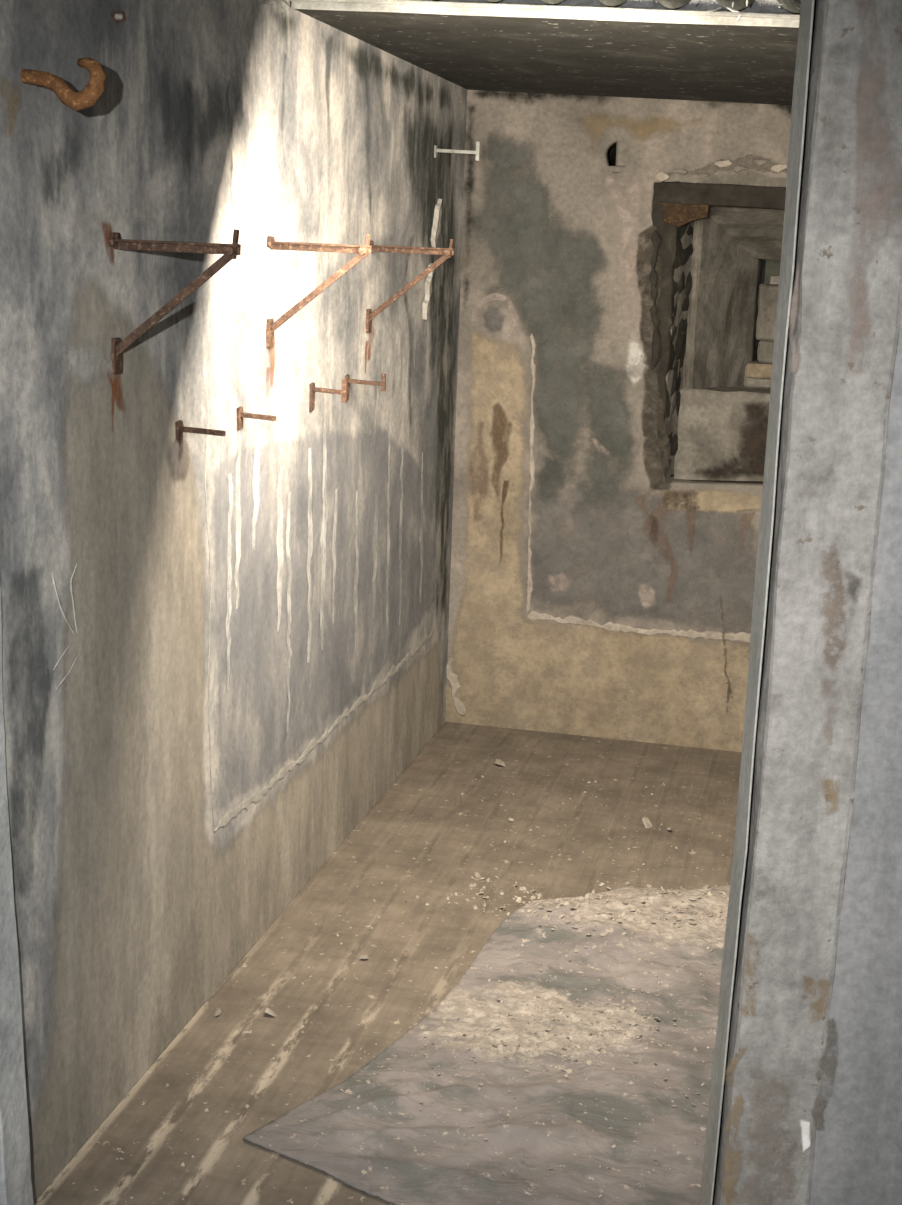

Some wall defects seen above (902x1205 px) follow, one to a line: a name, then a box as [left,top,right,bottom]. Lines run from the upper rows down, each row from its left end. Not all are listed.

leakage [162,78,244,164]
rust [103,223,114,262]
rust [108,359,123,423]
leakage [216,118,455,798]
rust [492,405,511,554]
leakage [477,138,756,629]
leakage [10,572,50,889]